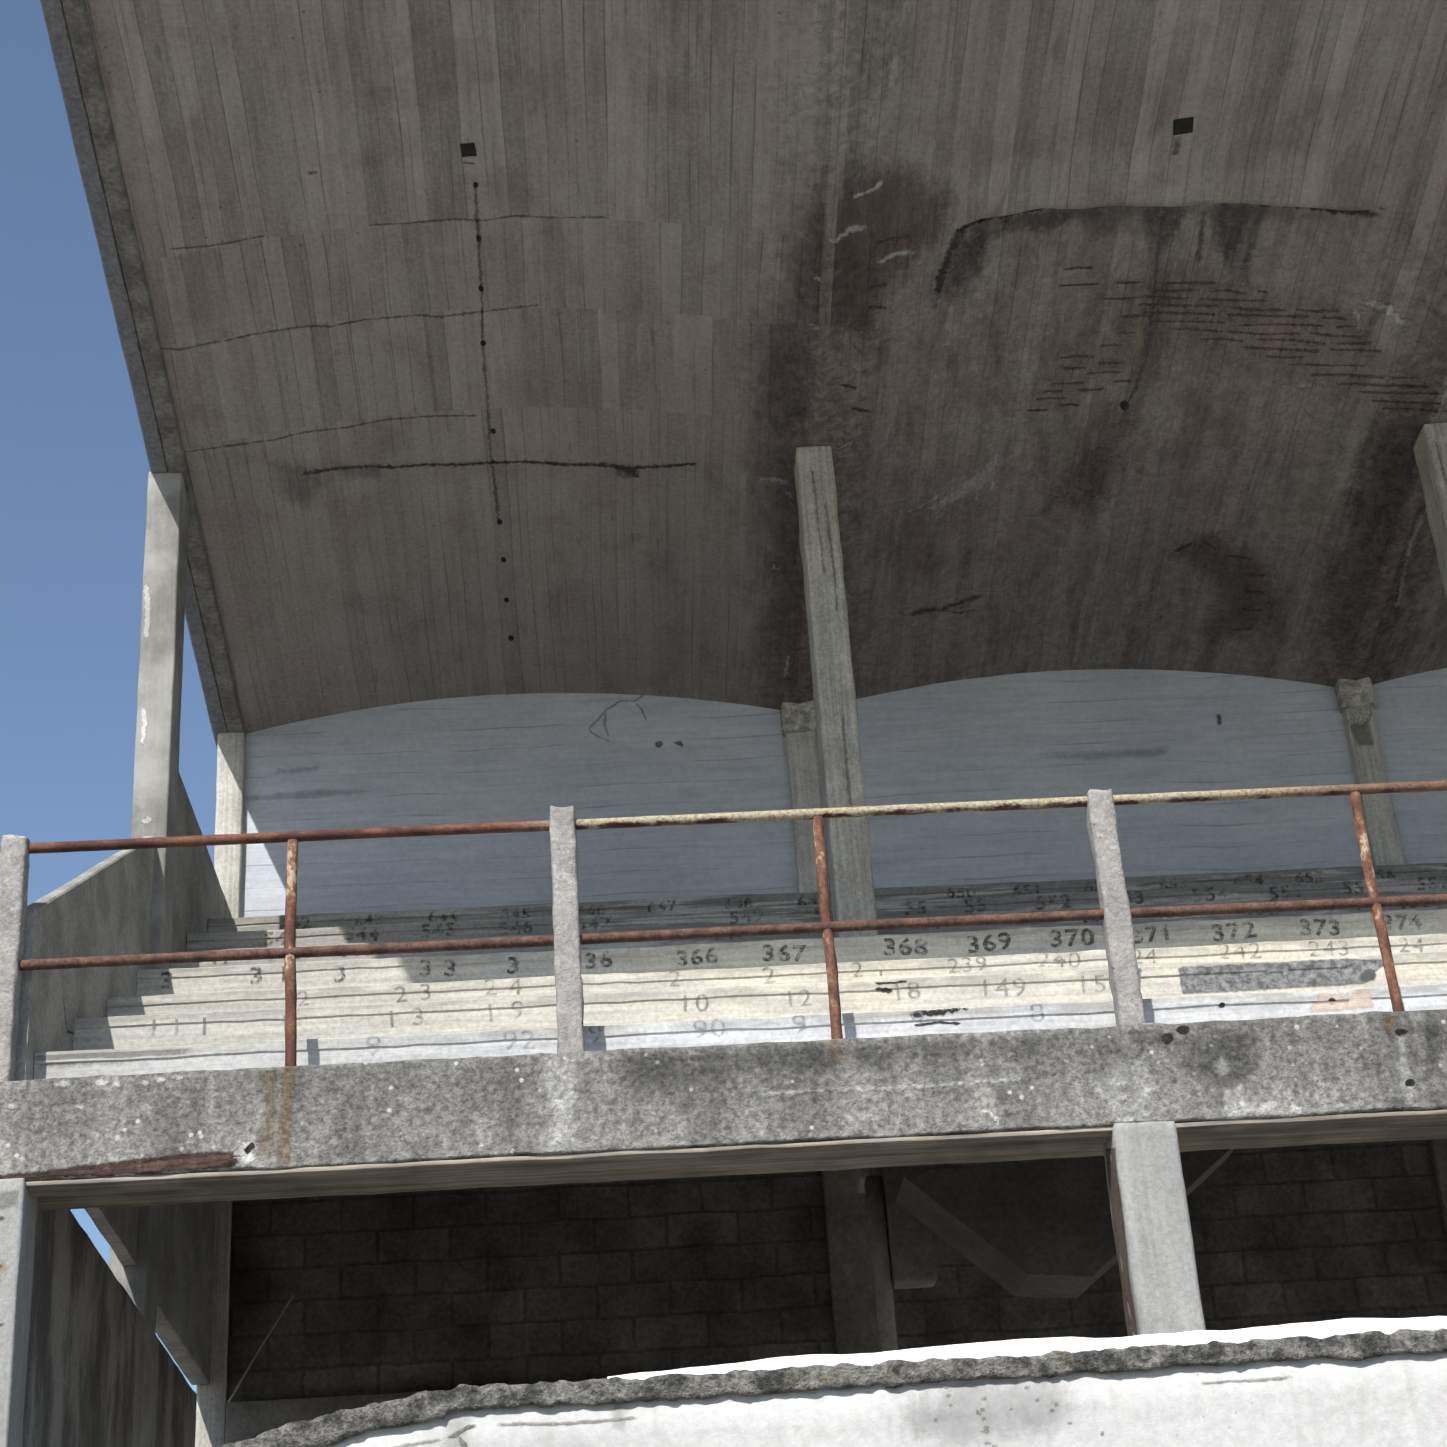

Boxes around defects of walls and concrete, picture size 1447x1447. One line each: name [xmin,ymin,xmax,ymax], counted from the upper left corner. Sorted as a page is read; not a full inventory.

crack [935,208,1051,293]
crack [1220,203,1385,217]
crack [161,182,698,562]
spalling [1027,266,1447,413]
damp [908,452,999,519]
rust [261,1068,293,1163]